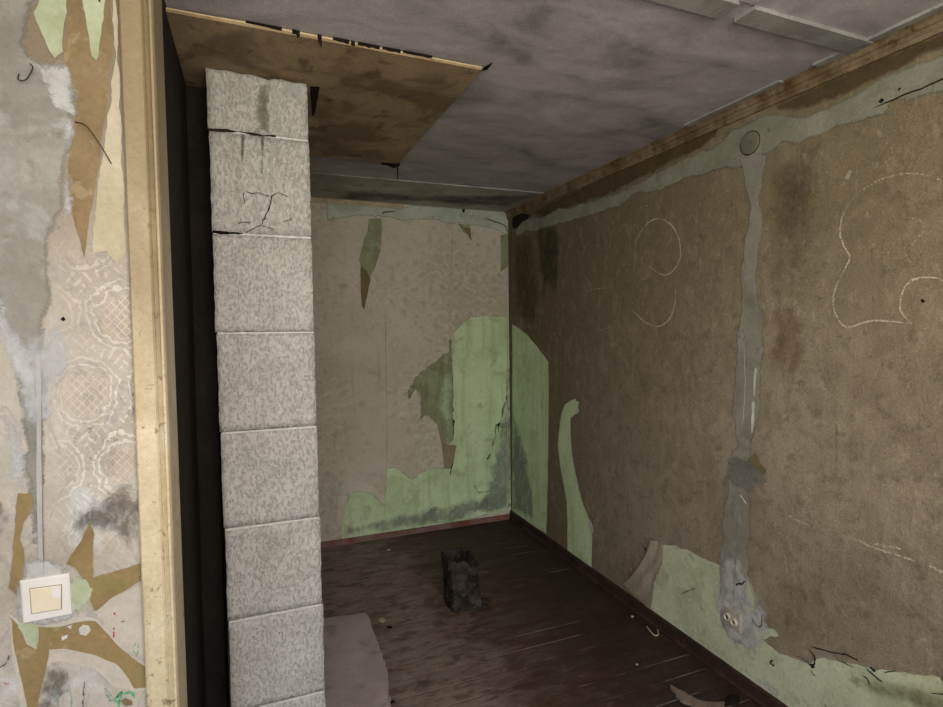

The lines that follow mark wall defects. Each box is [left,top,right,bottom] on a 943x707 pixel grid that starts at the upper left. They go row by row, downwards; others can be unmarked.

spalling [208,128,276,137]
crack [238,192,291,233]
flaking render [0,0,146,707]
peeling [327,56,943,567]
water stain [376,379,532,528]
peeling [651,544,943,707]